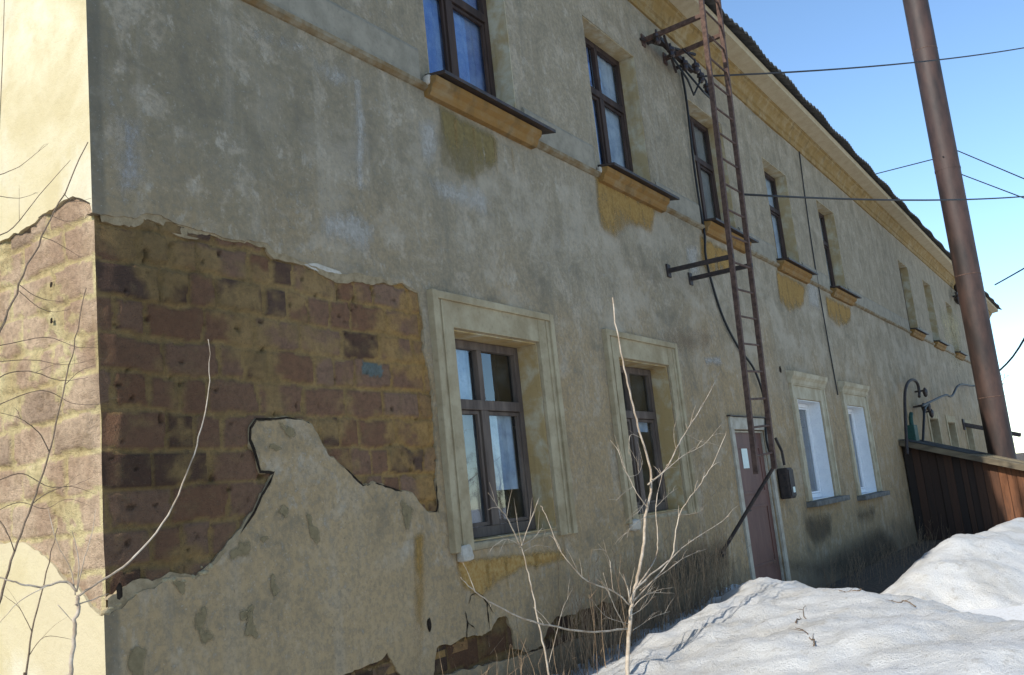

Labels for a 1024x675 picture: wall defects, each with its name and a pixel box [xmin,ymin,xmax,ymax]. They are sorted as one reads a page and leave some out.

spalling [0,197,439,616]
spalling [344,654,399,675]
spalling [434,597,639,675]